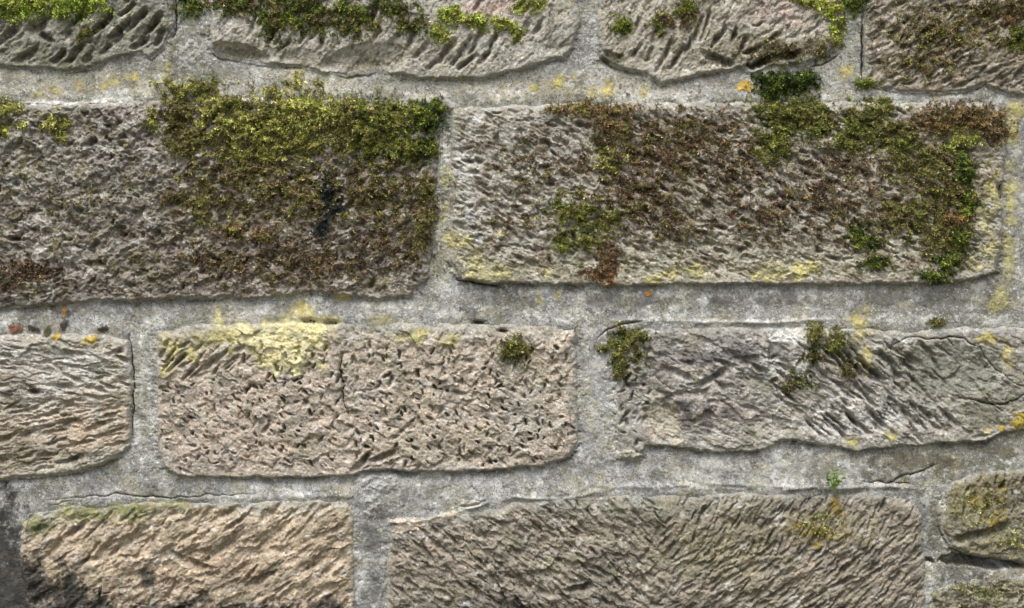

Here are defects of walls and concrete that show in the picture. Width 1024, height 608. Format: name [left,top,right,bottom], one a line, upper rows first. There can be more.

crack [893,336,1023,410]
crack [868,464,936,484]
crack [50,493,245,505]